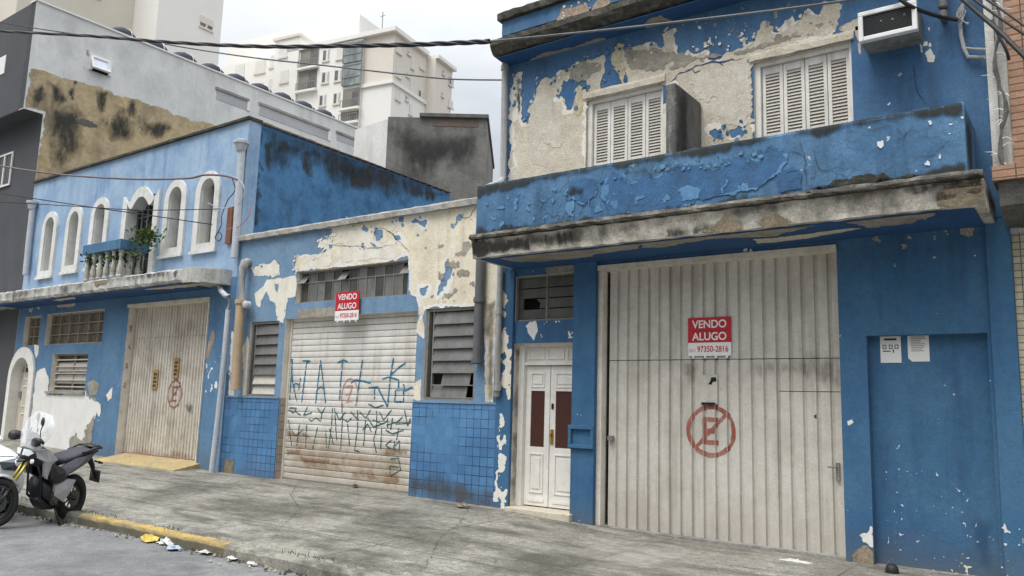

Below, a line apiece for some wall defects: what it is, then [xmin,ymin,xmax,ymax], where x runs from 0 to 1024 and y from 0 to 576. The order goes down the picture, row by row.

damp [25,69,216,180]
damp [258,133,469,200]
peeling [251,0,985,403]
crack [787,143,858,185]
peeling [28,368,112,450]
peeling [493,413,508,508]
spalling [852,526,874,565]